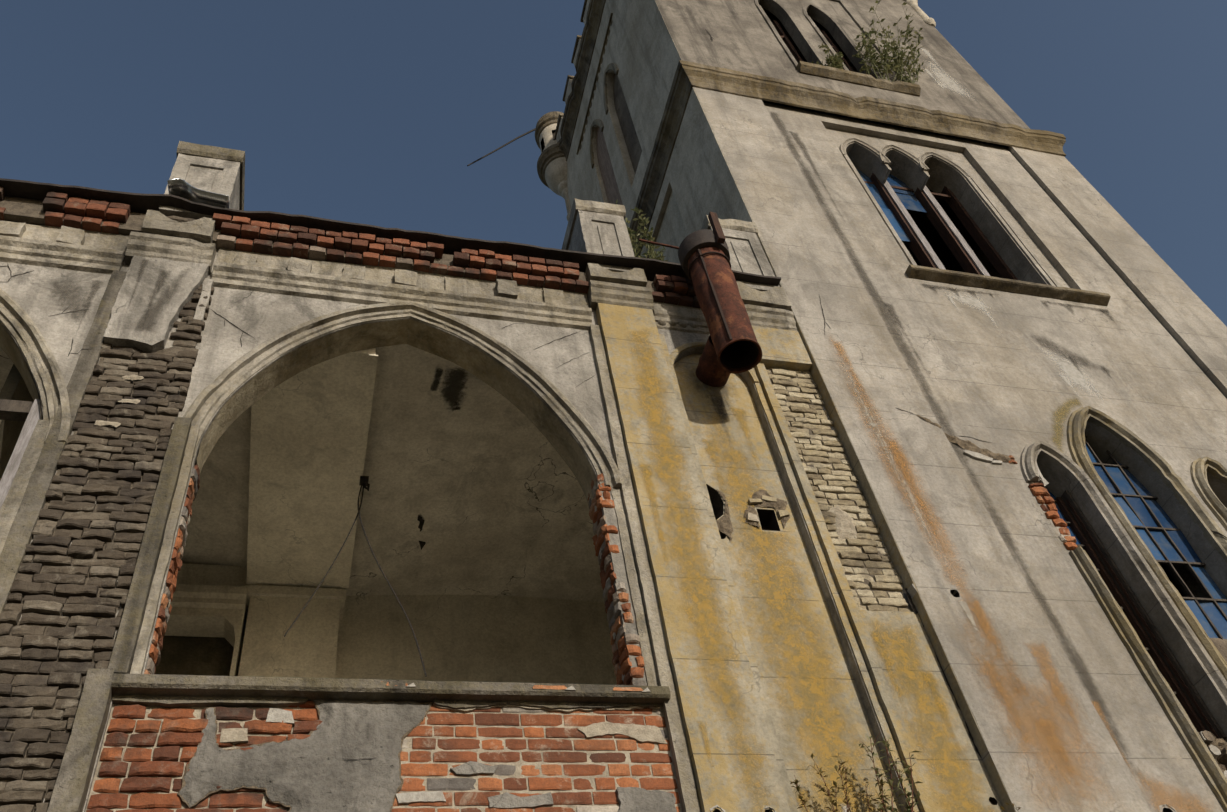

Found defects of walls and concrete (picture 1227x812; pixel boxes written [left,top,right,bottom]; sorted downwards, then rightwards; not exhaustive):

spalling [897,408,1018,465]
spalling [0,284,214,812]
spalling [417,514,426,550]
spalling [588,473,651,692]
spalling [706,484,790,541]
spalling [765,367,918,614]
spalling [1028,465,1078,551]
spalling [86,701,323,812]
spalling [392,705,680,812]
spalling [1198,730,1227,778]